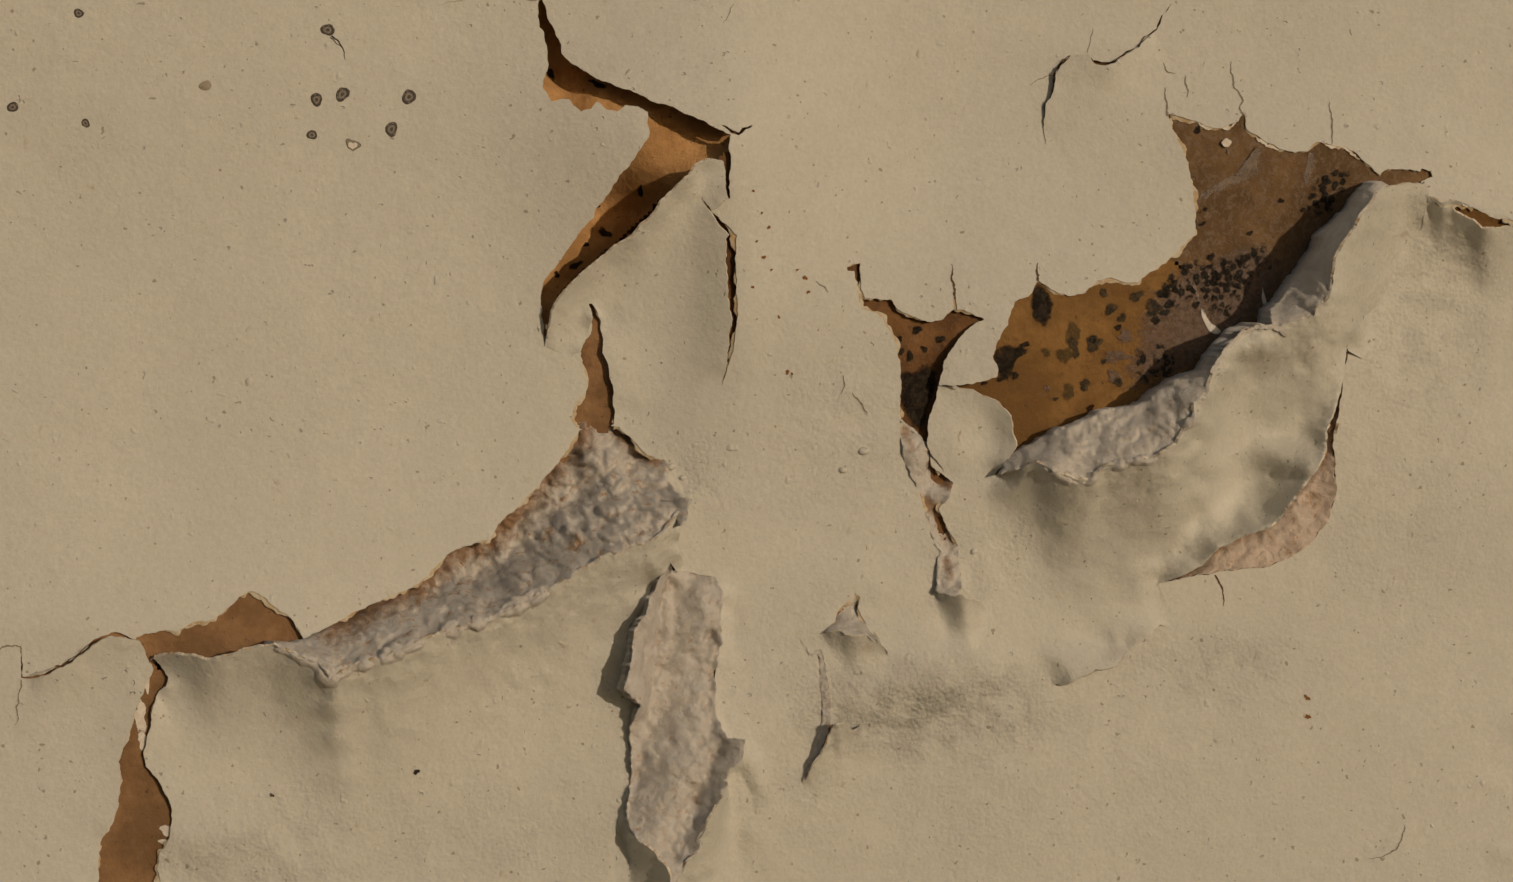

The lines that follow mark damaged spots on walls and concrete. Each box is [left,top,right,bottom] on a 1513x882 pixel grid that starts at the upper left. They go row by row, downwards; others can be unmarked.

damp [1196,148,1261,226]
damp [1301,152,1349,218]
damp [982,231,1279,390]
peeling [14,0,783,882]
damp [1044,378,1095,411]
peeling [847,114,1513,685]
crack [0,645,22,720]
peeling [800,593,898,834]